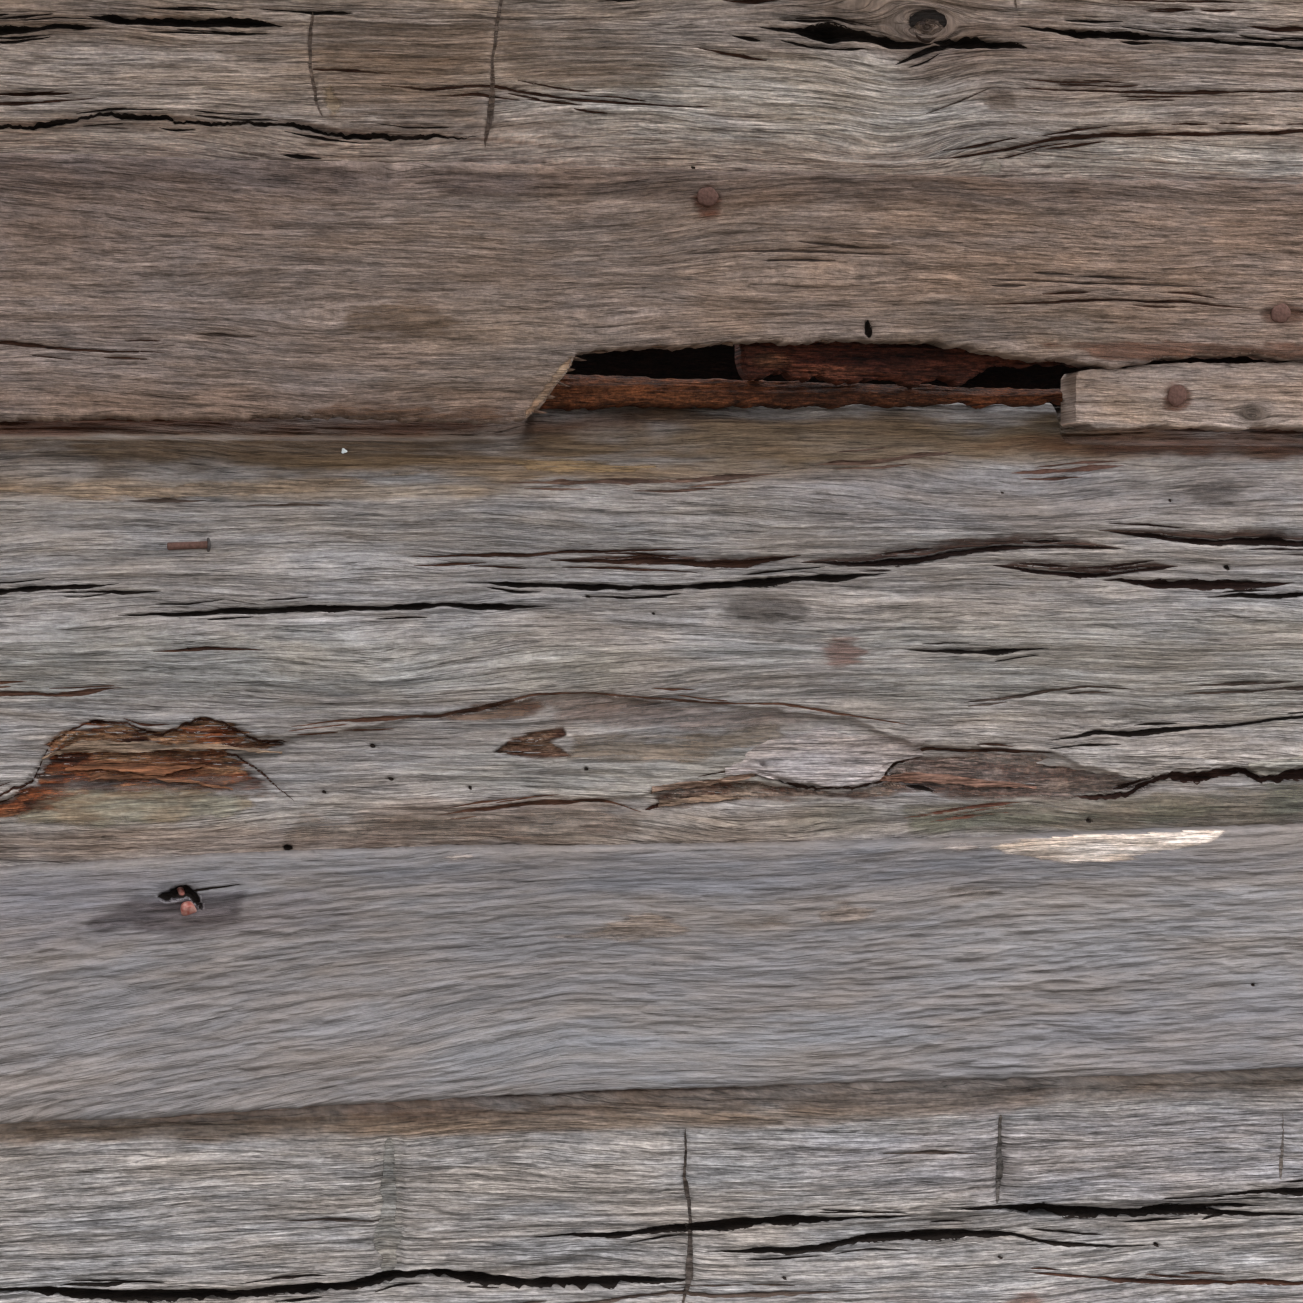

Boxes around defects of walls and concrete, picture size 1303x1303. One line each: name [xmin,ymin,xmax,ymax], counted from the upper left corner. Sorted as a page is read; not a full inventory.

crack [0,7,352,43]
crack [0,68,710,159]
crack [700,0,1303,160]
spalling [525,350,608,417]
crack [0,523,1303,652]
spalling [18,740,282,827]
crack [0,681,1303,822]
peeling [545,697,777,730]
spalling [651,727,1303,808]
corrosion [93,894,240,929]
crack [0,1180,1303,1303]